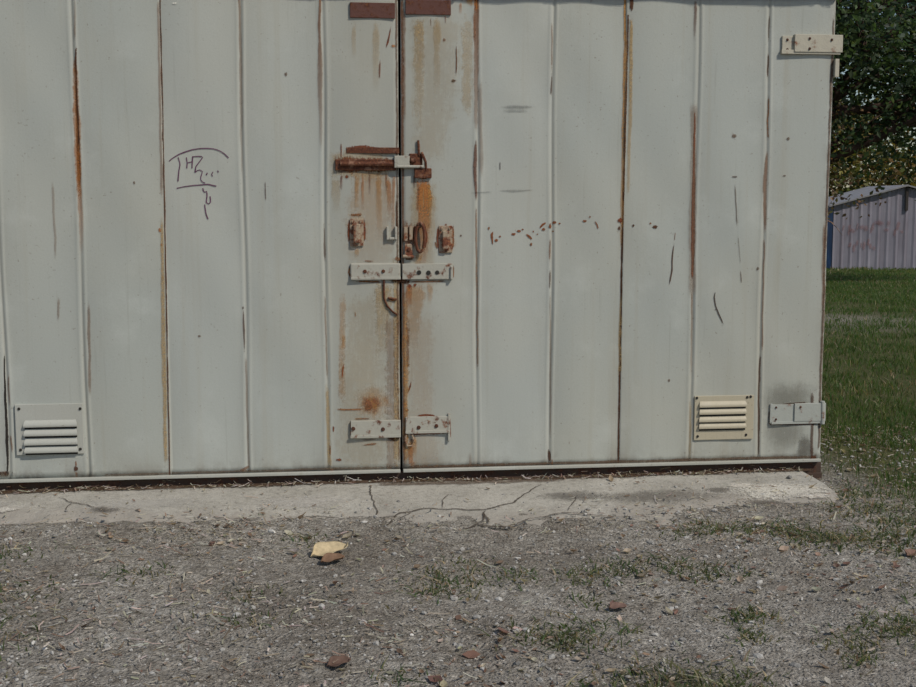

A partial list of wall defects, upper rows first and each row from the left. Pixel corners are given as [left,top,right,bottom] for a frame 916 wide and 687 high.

rust [0,0,821,494]
rust [819,55,833,403]
crack [369,485,649,529]